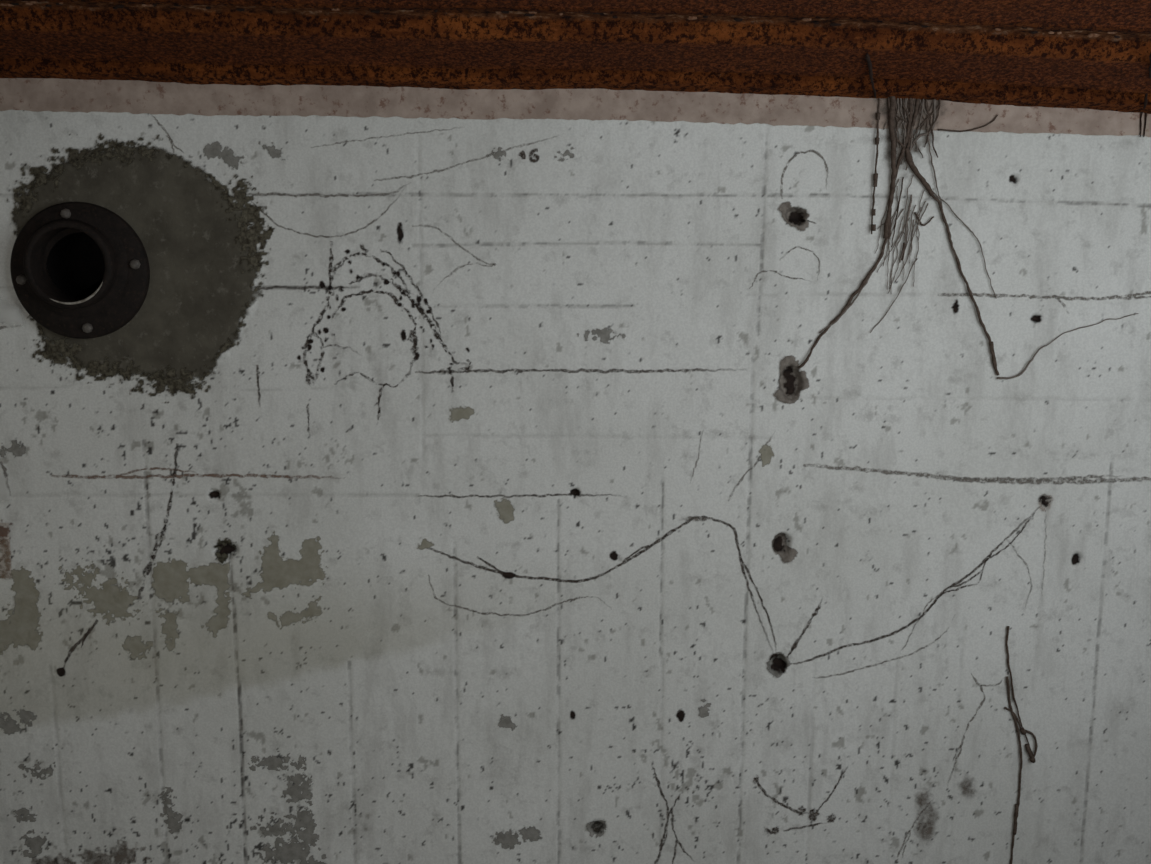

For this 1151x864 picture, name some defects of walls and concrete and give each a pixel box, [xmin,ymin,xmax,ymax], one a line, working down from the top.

crack [781,150,828,193]
crack [255,284,341,292]
crack [752,247,820,286]
crack [942,291,1151,306]
crack [430,440,1032,678]
peeling [0,567,43,655]
peeling [58,531,327,660]
crack [953,677,1001,770]
peeling [7,762,55,780]
peeling [13,806,150,864]
peeling [160,787,183,839]
peeling [243,751,326,864]